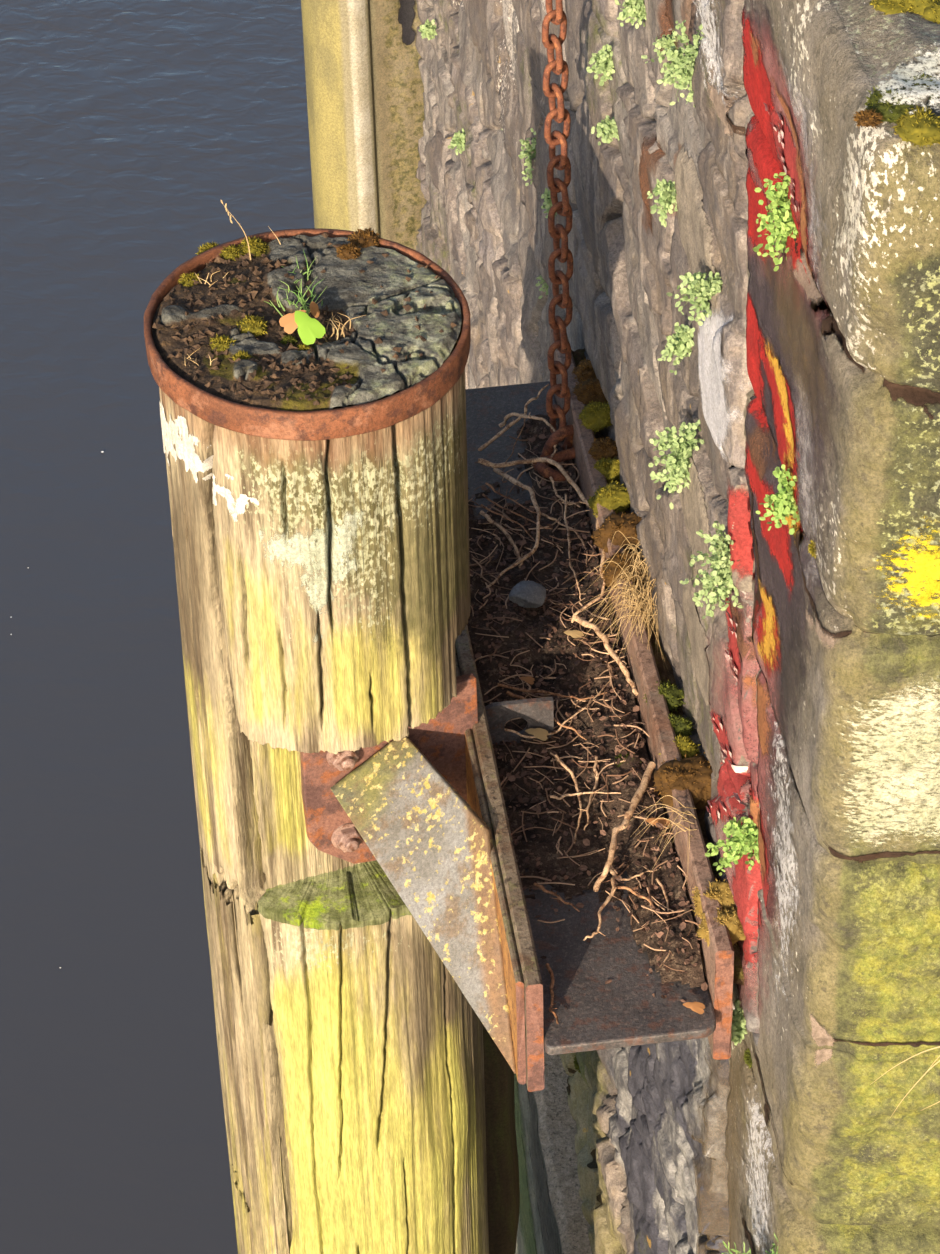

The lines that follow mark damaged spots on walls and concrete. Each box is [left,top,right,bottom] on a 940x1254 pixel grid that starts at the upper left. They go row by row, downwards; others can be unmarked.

crack [832,1038,940,1047]